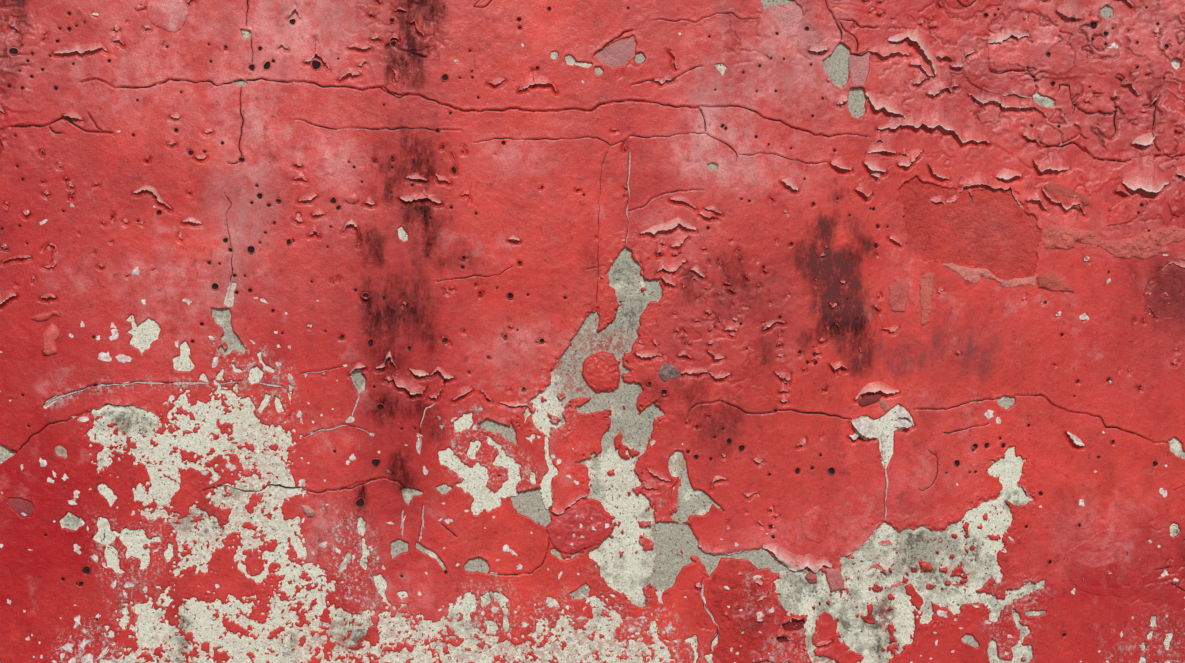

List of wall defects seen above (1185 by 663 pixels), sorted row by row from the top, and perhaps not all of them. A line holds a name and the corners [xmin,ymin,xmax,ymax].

leakage [386,0,445,86]
crack [12,113,110,134]
crack [83,0,862,295]
peeling [809,11,1089,332]
peeling [1116,132,1185,195]
leakage [796,217,882,371]
peeling [1133,258,1185,322]
spalling [0,445,16,464]
peeling [60,195,1046,663]
crack [687,401,851,420]
crack [919,399,994,491]
crack [1023,394,1167,443]